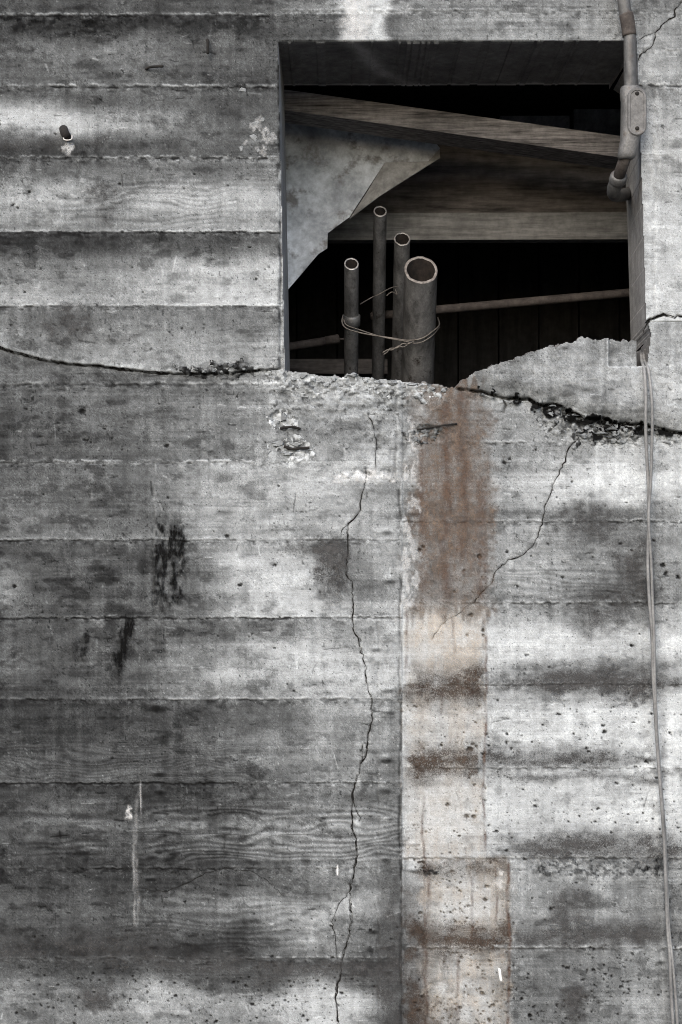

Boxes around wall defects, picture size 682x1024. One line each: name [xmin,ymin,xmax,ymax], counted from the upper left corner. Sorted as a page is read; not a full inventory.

crack [638,4,680,60]
crack [0,346,272,376]
spalling [173,358,447,405]
spalling [266,409,315,464]
spalling [401,423,457,446]
spalling [509,392,681,450]
rust [408,377,496,670]
crack [432,389,682,639]
water stain [152,523,187,605]
crack [331,414,377,1023]